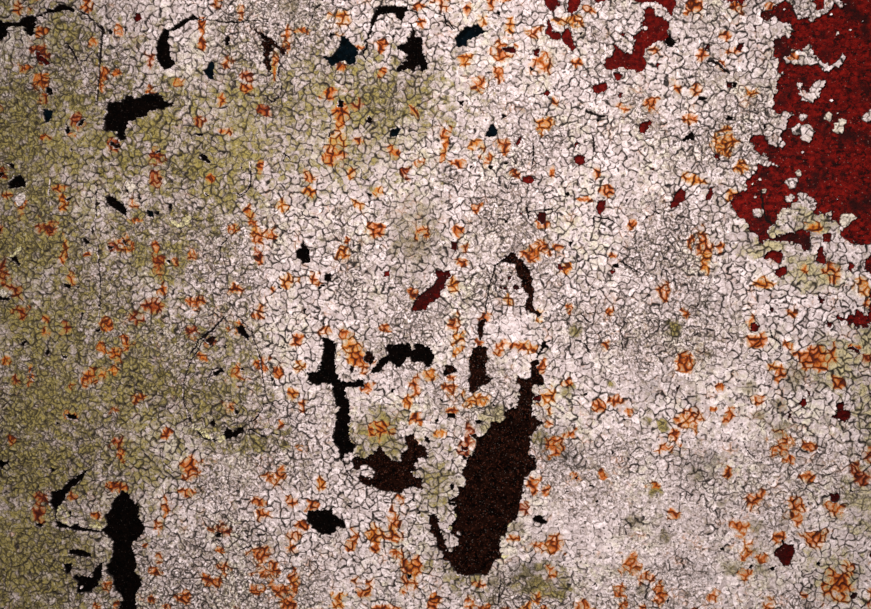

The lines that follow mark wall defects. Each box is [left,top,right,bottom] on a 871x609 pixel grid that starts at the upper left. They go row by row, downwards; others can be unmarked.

crack [67,11,105,97]
corrosion [318,87,365,180]
crack [586,111,609,153]
peeling [730,0,871,278]
crack [760,190,774,226]
crack [184,316,286,436]
peeling [307,338,434,493]
peeling [418,340,550,576]
corrosion [782,340,846,389]
peeling [51,470,145,609]
corrosion [345,493,423,594]
corrosion [613,552,668,609]